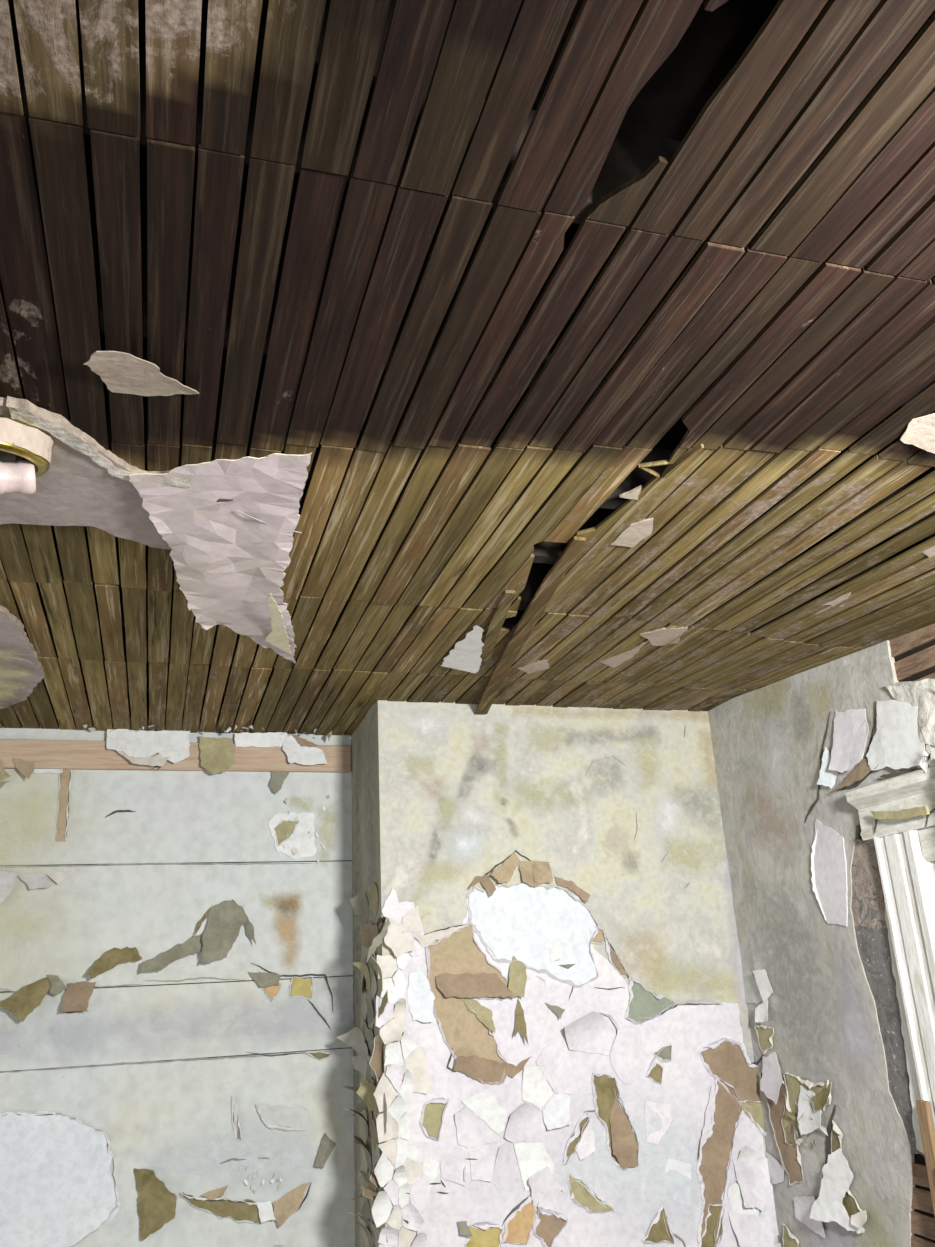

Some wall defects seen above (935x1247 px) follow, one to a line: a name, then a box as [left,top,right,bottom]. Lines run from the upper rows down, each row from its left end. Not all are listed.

peeling [129,452,312,663]
peeling [0,758,72,843]
peeling [83,724,332,863]
peeling [0,870,77,904]
peeling [0,899,256,1022]
crack [95,977,248,988]
peeling [248,736,867,1247]
flaking render [804,623,935,1247]
peeling [0,1110,121,1247]